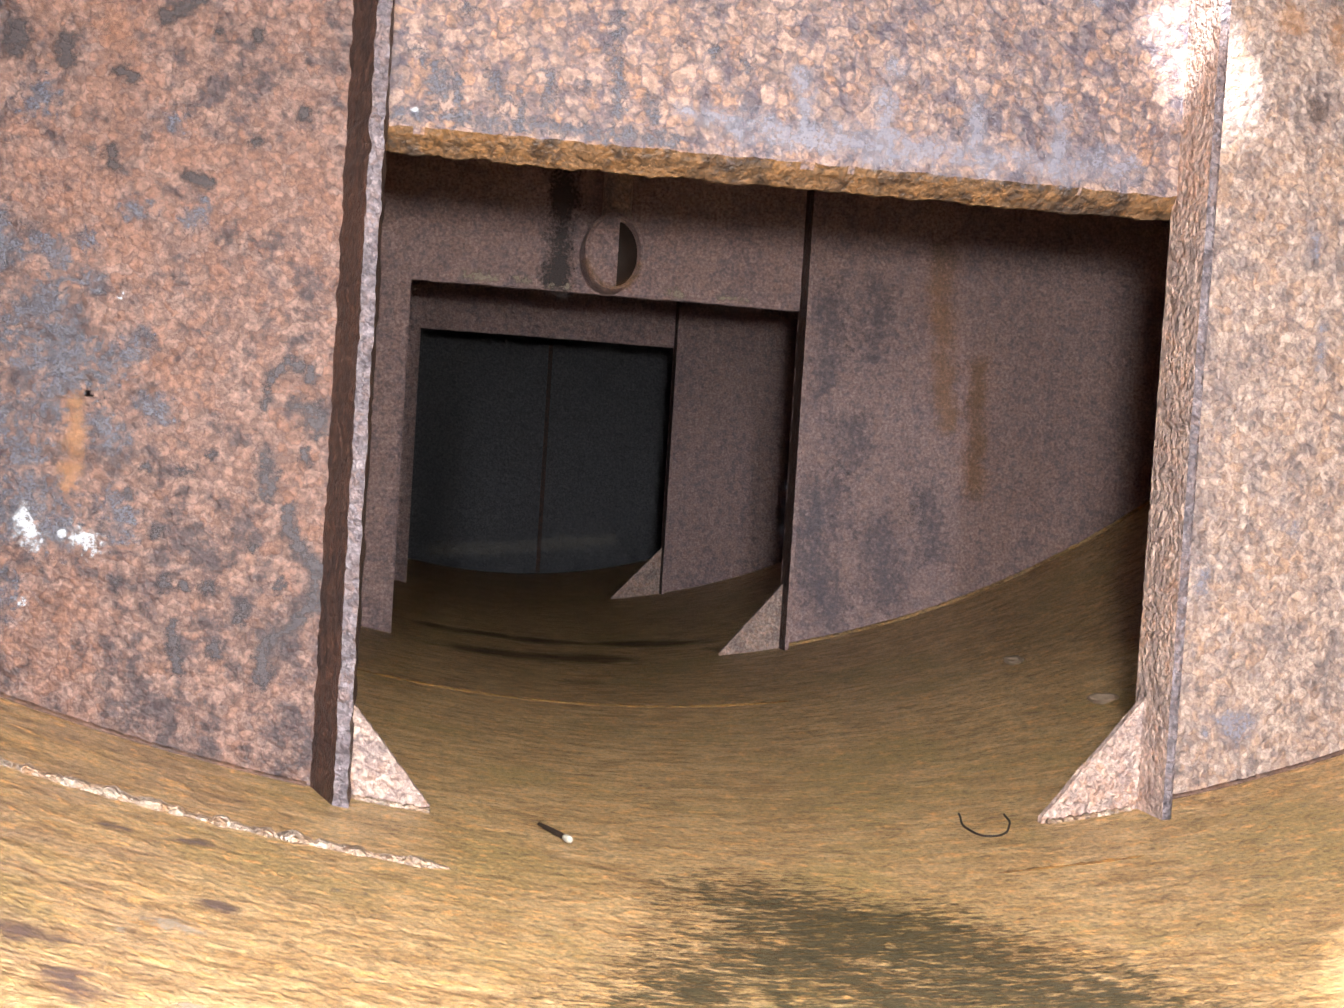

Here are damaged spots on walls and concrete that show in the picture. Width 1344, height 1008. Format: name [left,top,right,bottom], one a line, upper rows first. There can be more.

leakage [10,69,65,118]
leakage [463,169,583,297]
leakage [0,205,176,563]